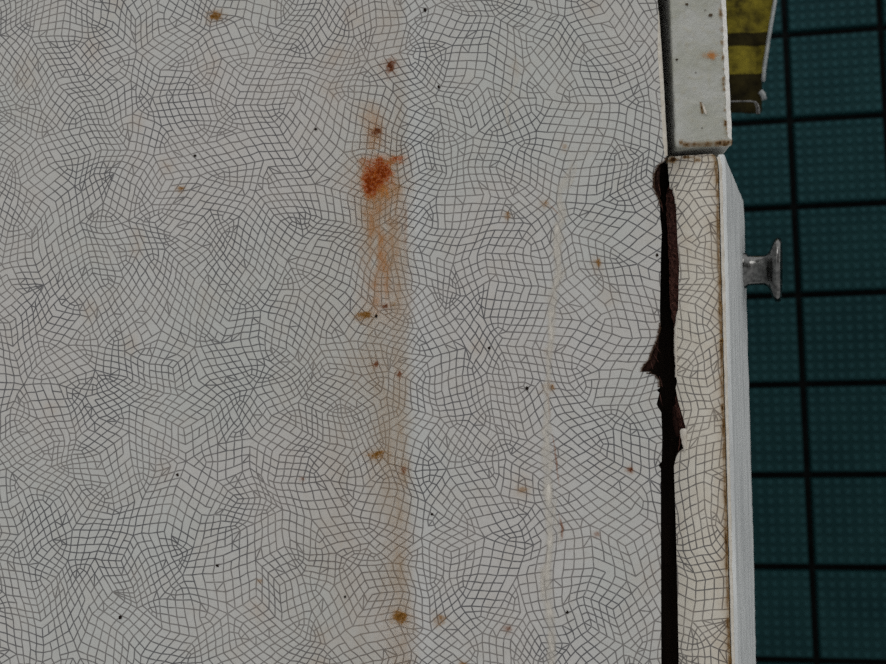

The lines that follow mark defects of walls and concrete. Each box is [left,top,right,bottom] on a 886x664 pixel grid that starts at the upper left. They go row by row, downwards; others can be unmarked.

corrosion [362,157,401,270]
peeling [640,323,663,403]
corrosion [393,611,407,624]